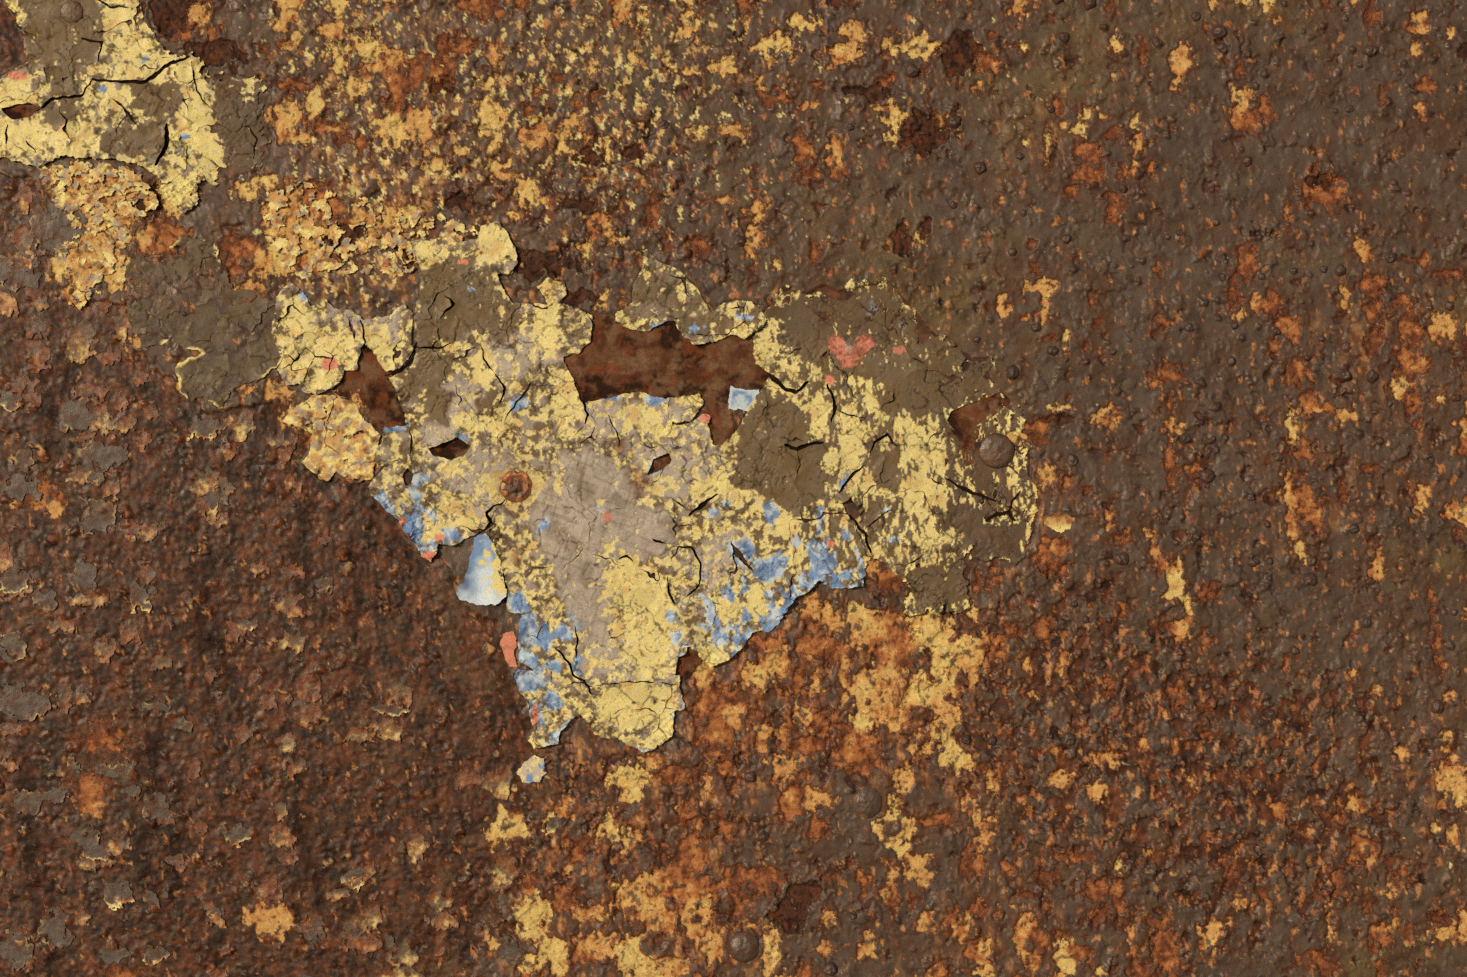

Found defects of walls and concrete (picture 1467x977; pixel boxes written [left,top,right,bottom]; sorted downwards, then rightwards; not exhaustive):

crack [5,0,209,166]
rust [308,0,529,156]
rust [1190,12,1277,137]
crack [385,295,506,414]
peeling [0,0,1124,977]
crack [618,494,718,604]
crack [768,348,897,553]
crack [931,477,1020,522]
rust [1220,234,1467,586]
crack [555,625,684,699]
rust [650,660,850,850]
rust [941,838,1188,977]